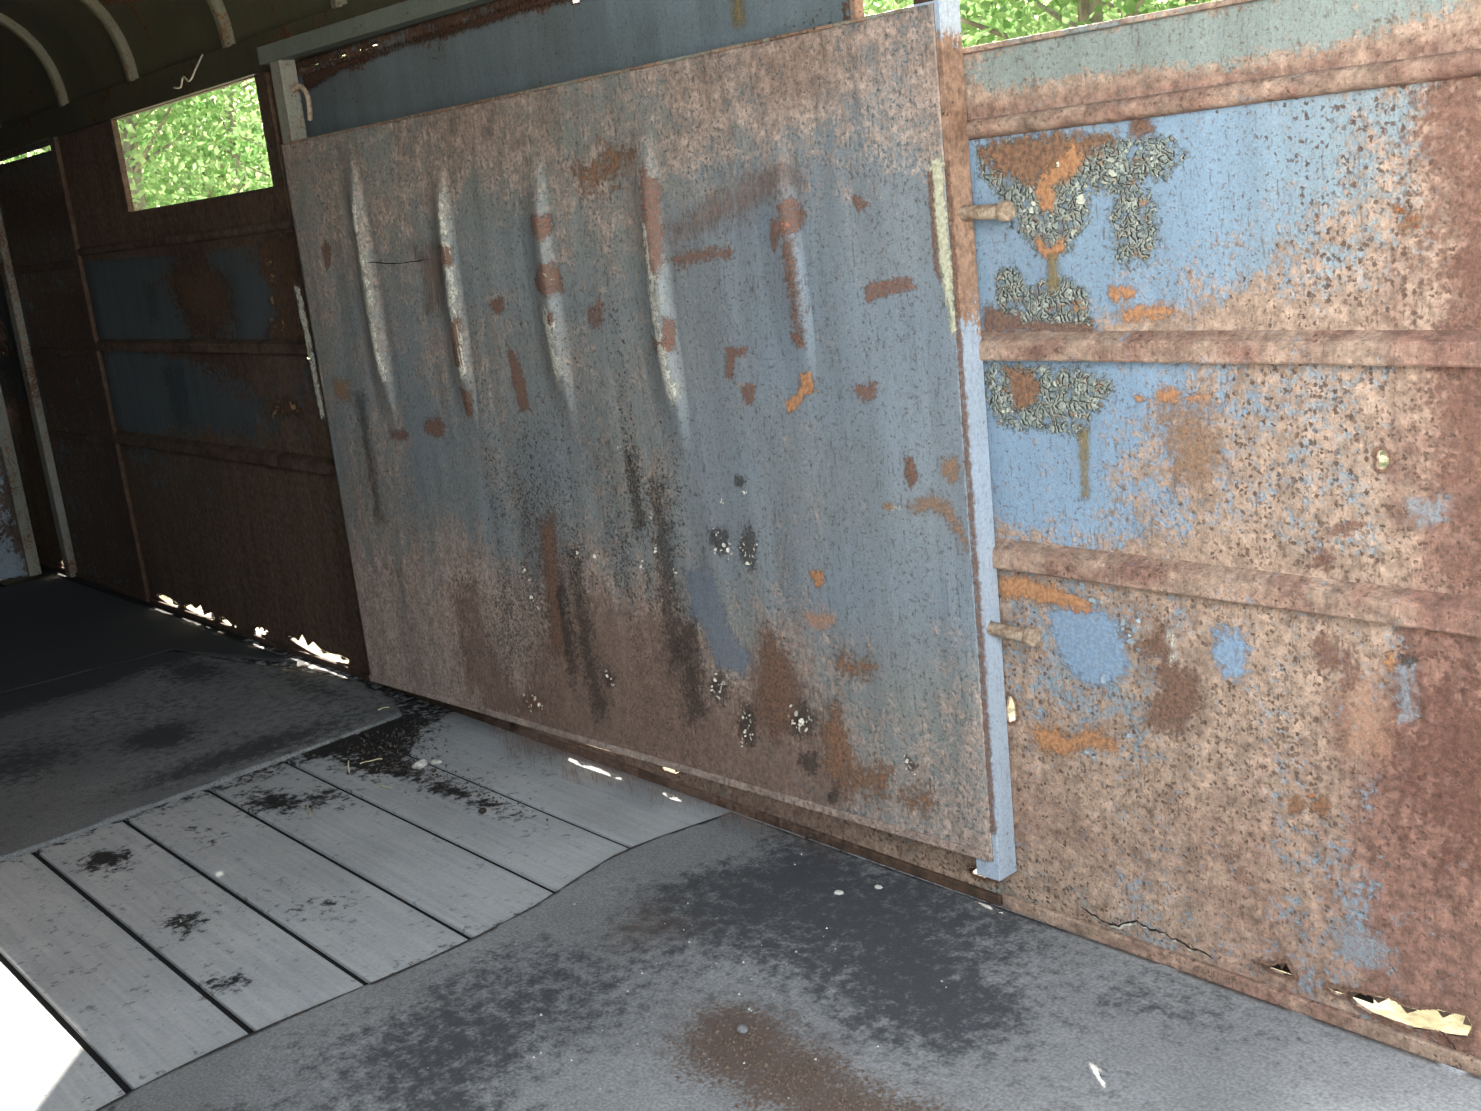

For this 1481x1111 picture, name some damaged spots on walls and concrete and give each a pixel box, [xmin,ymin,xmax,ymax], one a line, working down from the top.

rust [302,0,572,90]
rust [786,371,817,413]
rust [865,276,917,303]
peeling [984,362,1114,497]
peeling [976,125,1187,326]
rust [1108,285,1176,323]
rust [1367,77,1481,331]
rust [522,515,608,718]
rust [617,446,710,726]
rust [756,630,940,818]
rust [1312,634,1481,893]
crack [1080,908,1212,959]